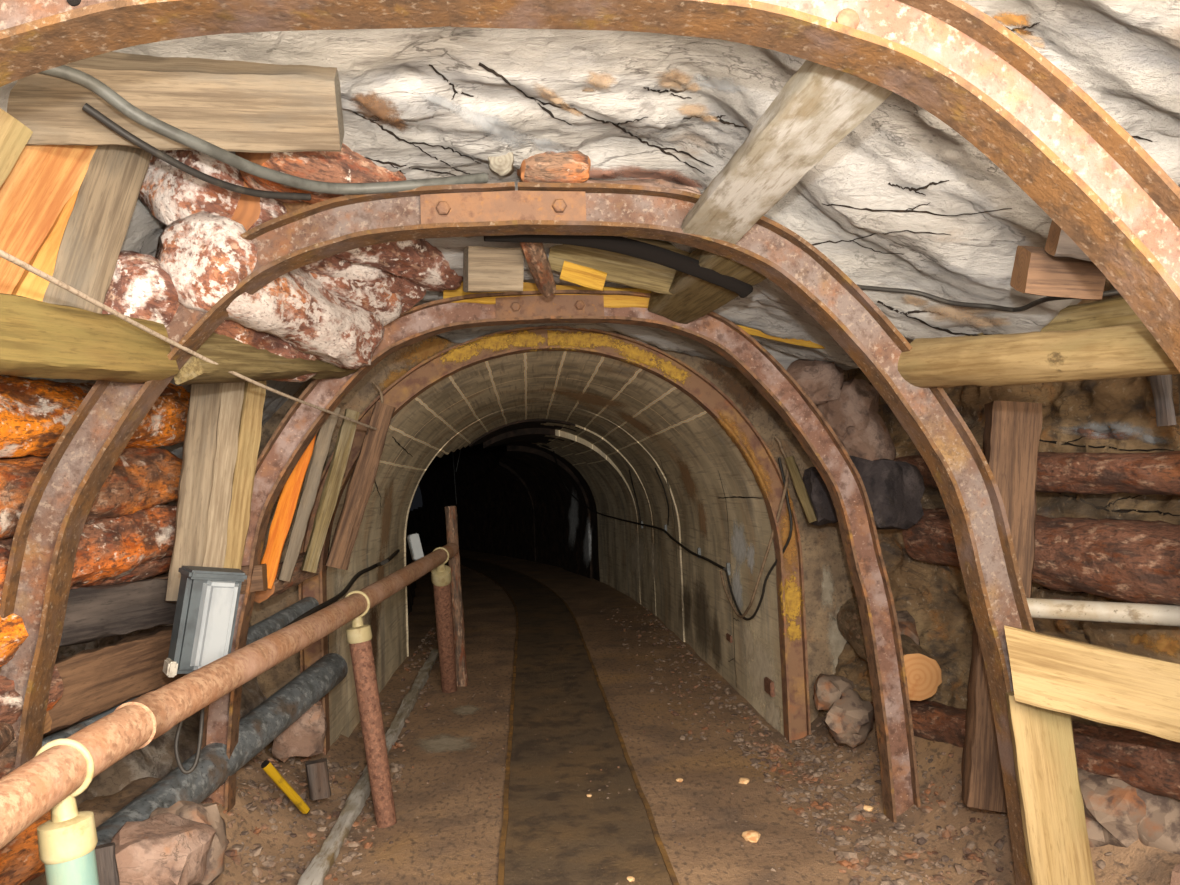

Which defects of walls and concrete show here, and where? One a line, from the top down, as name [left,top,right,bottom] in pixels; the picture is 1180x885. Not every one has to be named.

corrosion [993,13,1043,48]
corrosion [352,93,408,130]
crack [429,64,474,99]
crack [479,63,746,174]
corrosion [661,71,716,121]
crack [353,112,479,176]
corrosion [589,167,701,187]
crack [812,180,1012,255]
crack [877,300,994,336]
corrosion [905,296,1005,326]
corrosion [779,488,797,572]
corrosion [369,603,381,670]